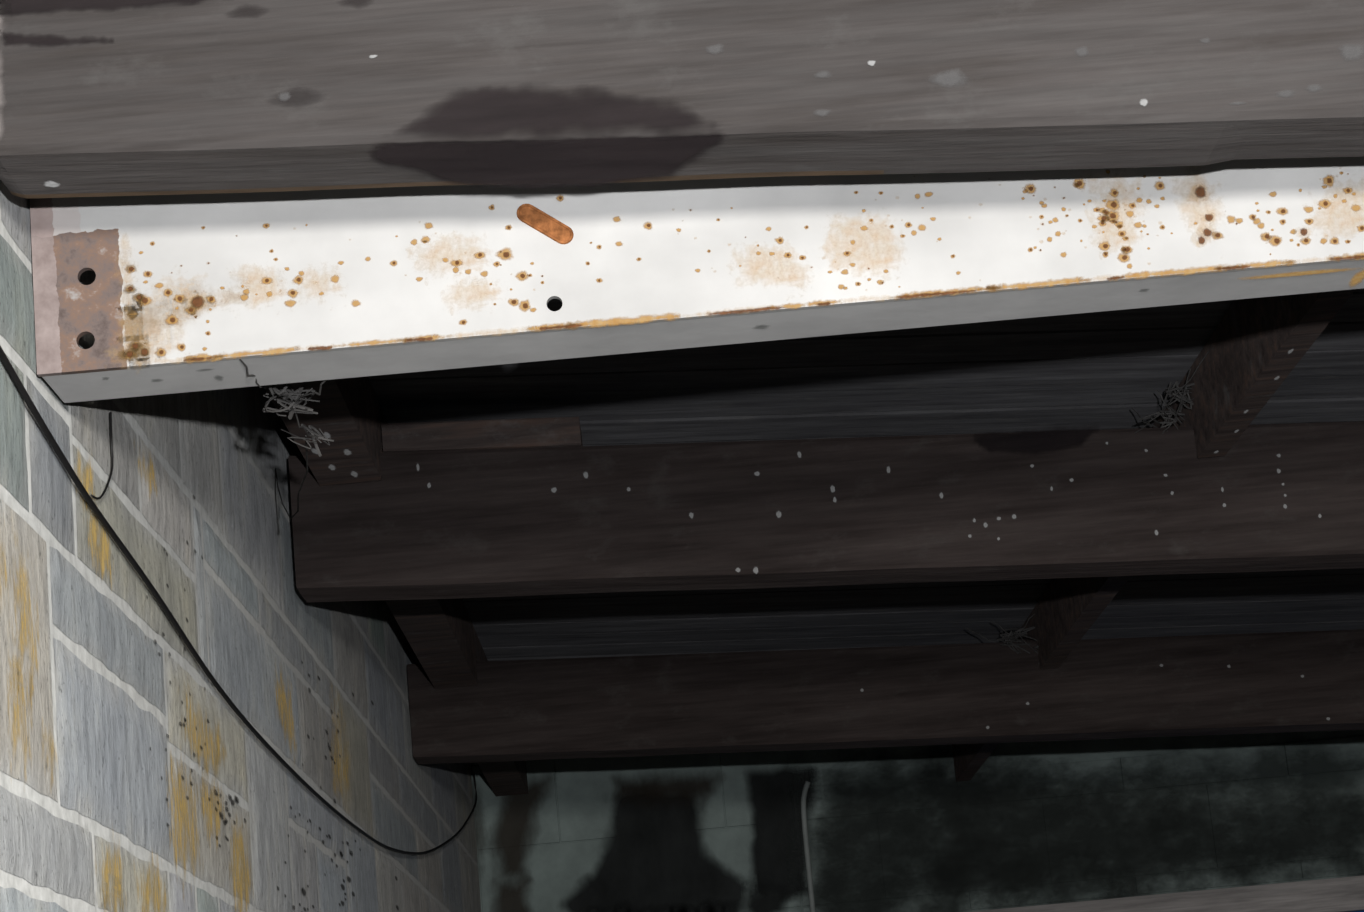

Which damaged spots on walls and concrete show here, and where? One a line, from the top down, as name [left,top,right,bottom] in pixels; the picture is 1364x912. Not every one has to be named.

leakage [373,90,722,188]
corrosion [121,242,332,362]
corrosion [443,249,511,285]
corrosion [506,204,574,244]
corrosion [494,262,679,331]
corrosion [710,209,888,315]
corrosion [890,192,936,237]
corrosion [897,255,1089,298]
corrosion [1022,172,1364,286]
leakage [290,806,361,906]
leakage [495,783,545,912]
leakage [566,751,1364,912]